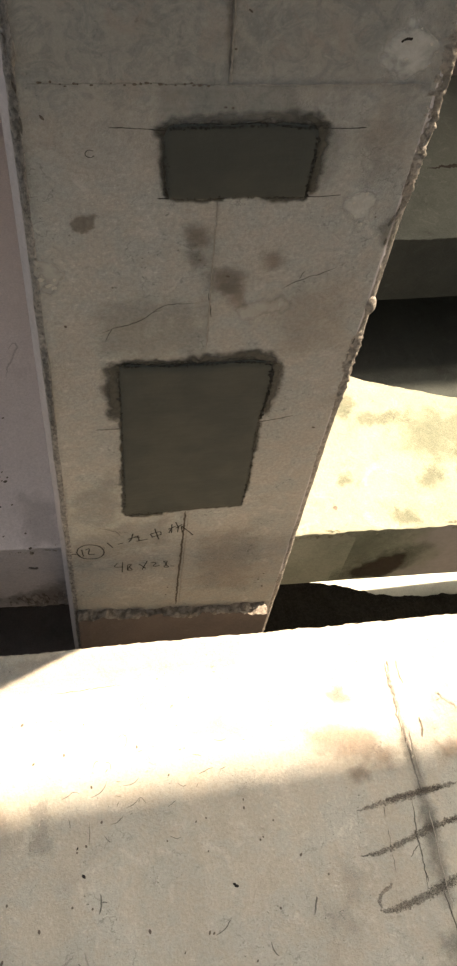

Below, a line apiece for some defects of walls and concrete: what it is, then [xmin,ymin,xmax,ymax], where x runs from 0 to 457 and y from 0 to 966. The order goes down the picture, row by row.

spalling [370,3,457,297]
crack [103,293,211,340]
spalling [262,314,369,631]
crack [384,796,429,891]